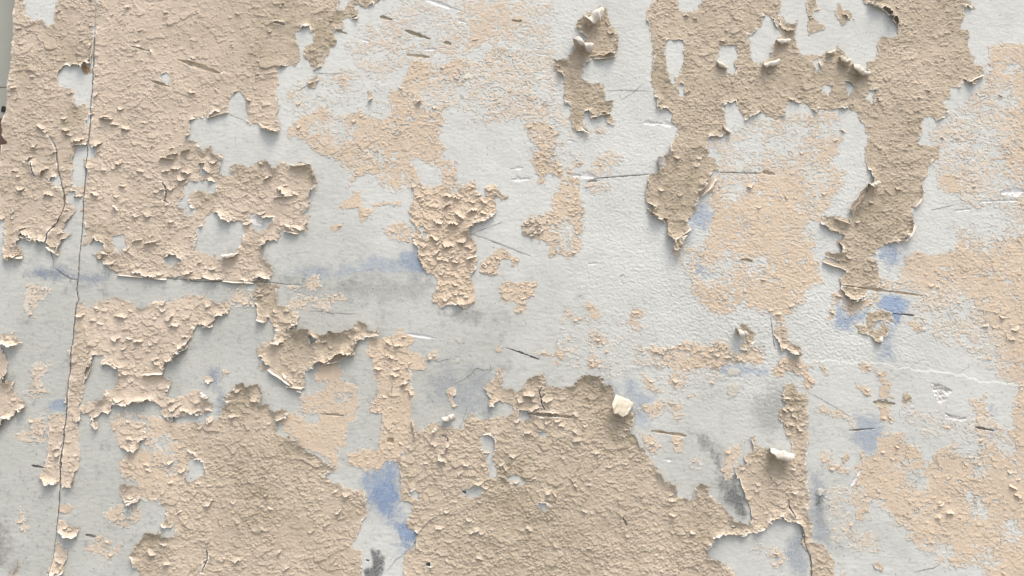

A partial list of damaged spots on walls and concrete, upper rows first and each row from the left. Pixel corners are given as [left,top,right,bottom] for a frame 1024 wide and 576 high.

crack [30,8,96,568]
peeling [0,0,379,284]
peeling [13,279,836,576]
peeling [281,0,625,309]
peeling [643,0,1024,576]